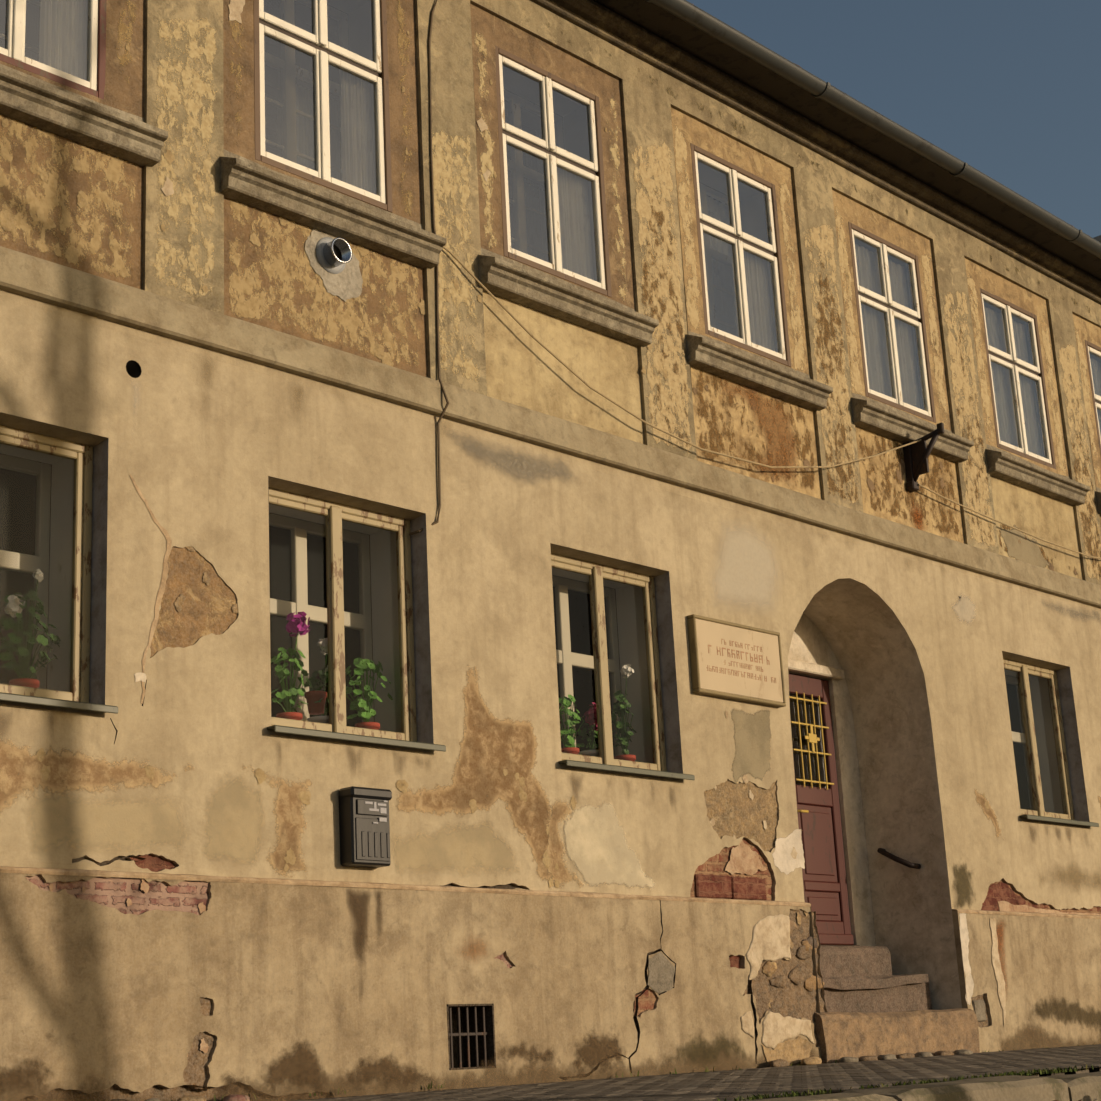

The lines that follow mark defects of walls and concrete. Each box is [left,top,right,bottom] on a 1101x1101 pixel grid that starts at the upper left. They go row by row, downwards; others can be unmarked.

peeling [228,33,497,379]
peeling [605,97,1027,552]
flaking render [150,546,239,658]
peeling [396,668,584,888]
flaking render [690,775,779,901]
water stain [0,1061,96,1101]
flaking render [44,1031,252,1101]
water stain [224,1036,770,1101]
crack [586,900,676,1077]
flaking render [729,909,827,1066]
water stain [990,918,1006,1026]
water stain [1002,1028,1101,1051]